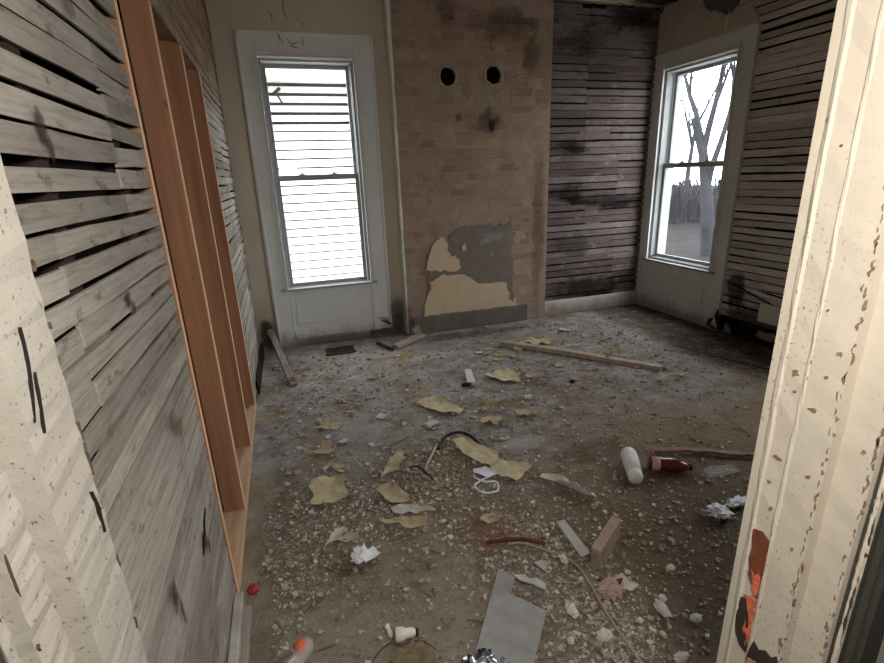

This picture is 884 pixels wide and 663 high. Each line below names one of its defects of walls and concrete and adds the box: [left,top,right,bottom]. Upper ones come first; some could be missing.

crack [267,0,304,48]
peeling [424,237,517,317]
peeling [855,204,884,330]
peeling [829,344,857,436]
peeling [75,421,95,475]
peeling [4,554,21,597]
peeling [735,448,829,663]